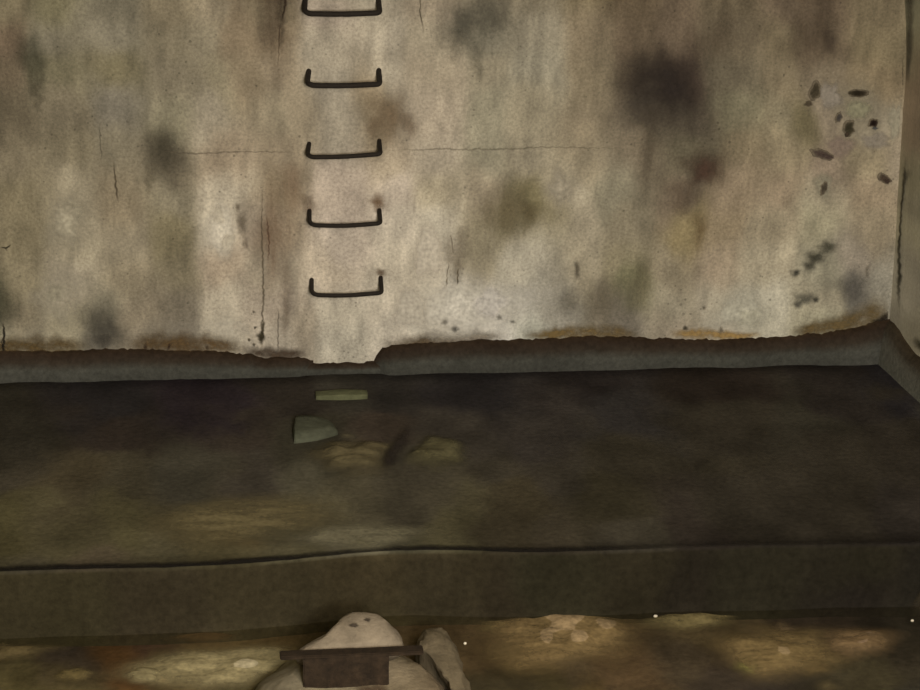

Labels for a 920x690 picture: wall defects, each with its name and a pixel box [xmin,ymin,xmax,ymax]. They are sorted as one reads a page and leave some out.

spalling [805,79,821,106]
spalling [848,89,869,98]
spalling [835,111,855,137]
spalling [809,148,834,161]
spalling [877,172,892,184]
crack [248,216,279,346]
rust [802,306,883,334]
rust [534,327,625,338]
rust [680,330,753,339]